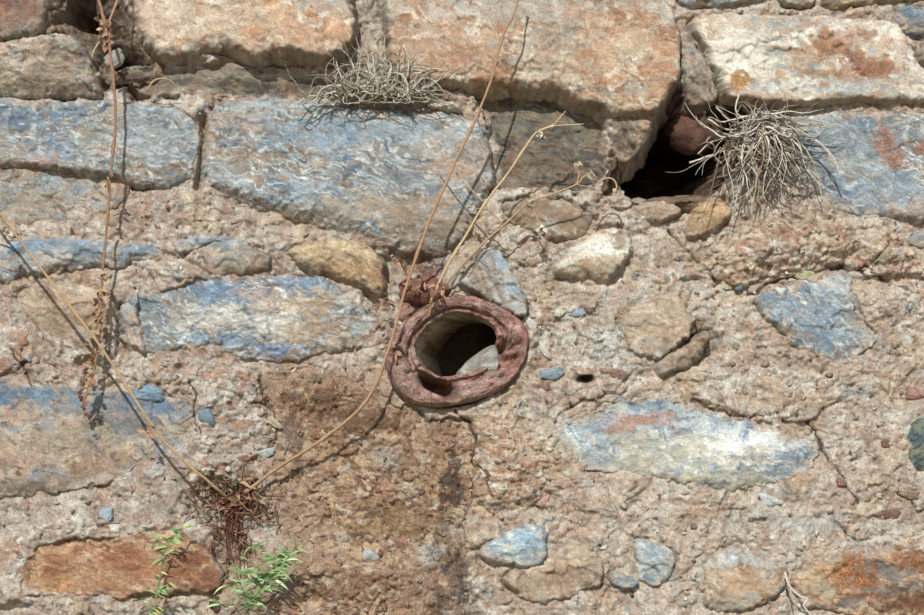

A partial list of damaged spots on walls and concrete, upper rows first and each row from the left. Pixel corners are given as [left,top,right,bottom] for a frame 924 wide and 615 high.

damp [440,454,464,505]
crack [454,409,494,498]
crack [691,398,859,504]